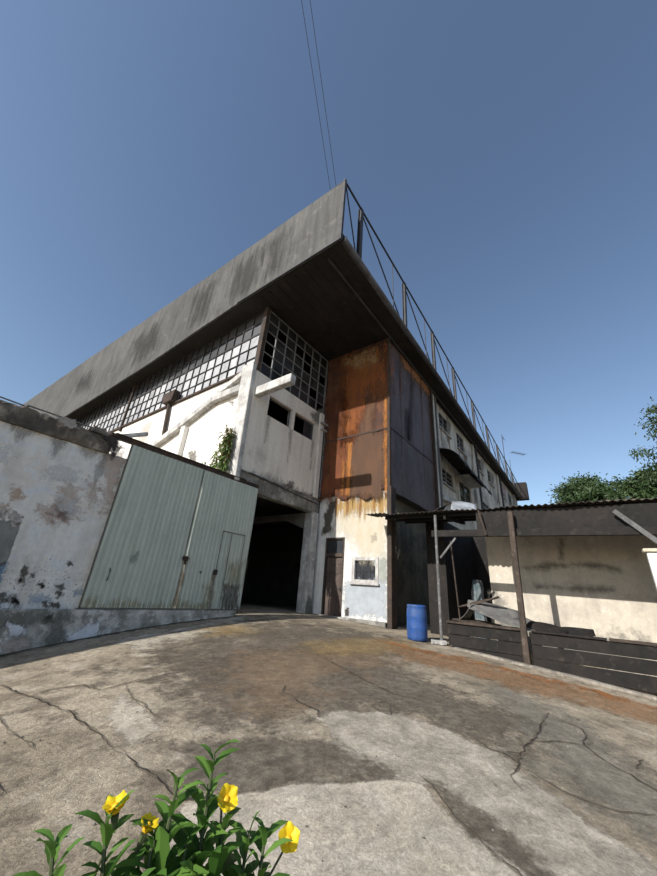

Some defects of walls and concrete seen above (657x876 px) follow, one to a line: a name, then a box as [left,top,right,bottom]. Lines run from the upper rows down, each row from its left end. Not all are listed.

spalling [56,414,79,429]
rust [318,345,433,517]
peeling [0,484,25,583]
rust [389,642,657,723]
crack [0,670,217,799]
crack [476,713,655,815]